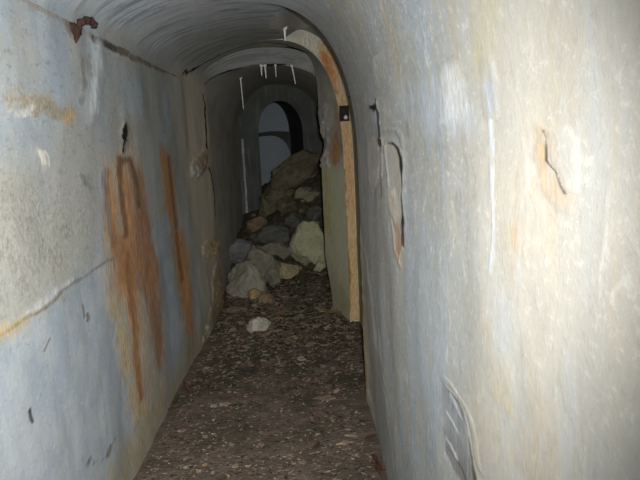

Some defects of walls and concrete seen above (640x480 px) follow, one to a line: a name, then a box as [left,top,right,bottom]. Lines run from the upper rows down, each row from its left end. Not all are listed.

crack [18,0,310,231]
spalling [318,102,334,168]
crack [374,96,384,199]
spalling [366,110,410,274]
crack [0,258,111,352]
corrosion [85,133,200,446]